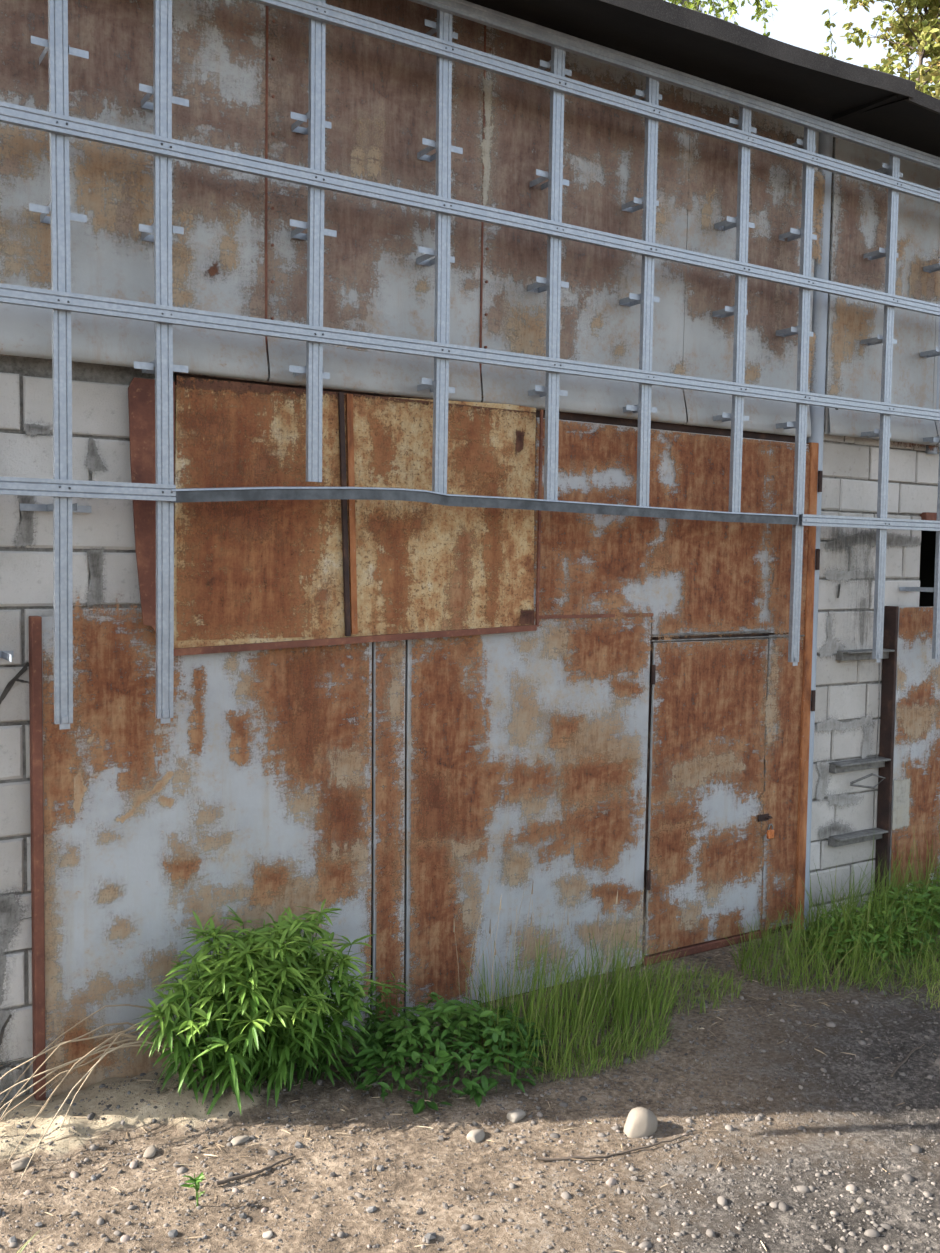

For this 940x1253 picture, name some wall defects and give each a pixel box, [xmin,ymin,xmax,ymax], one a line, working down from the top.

rust [0,0,49,111]
rust [68,0,154,124]
rust [172,0,309,167]
rust [325,24,437,195]
rust [326,0,437,38]
rust [69,139,154,249]
rust [172,159,308,325]
rust [323,189,435,333]
rust [450,15,940,396]
peeling [116,771,175,823]
rust [43,372,810,1097]
rust [891,663,940,894]